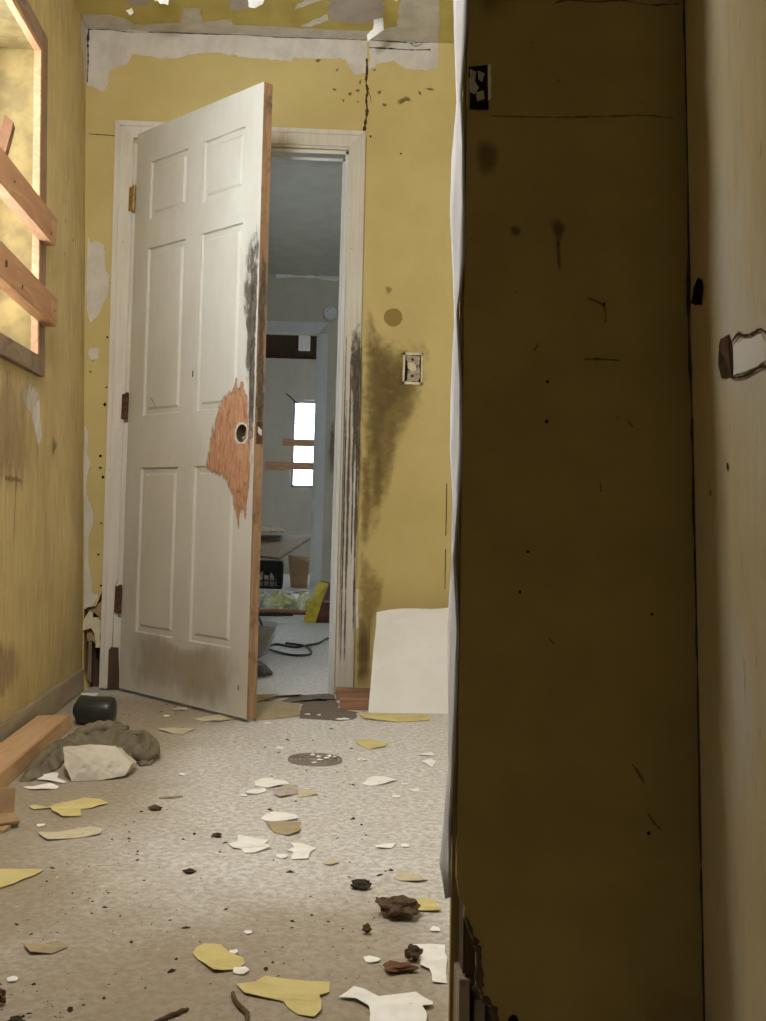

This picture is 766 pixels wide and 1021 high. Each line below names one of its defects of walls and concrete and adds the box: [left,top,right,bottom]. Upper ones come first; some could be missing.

crack [84,29,431,131]
peeling [82,0,440,92]
peeling [86,238,110,323]
leakage [384,309,402,326]
peeling [21,382,42,445]
peeling [416,0,468,911]
leakage [329,332,414,672]
crack [492,0,705,1021]
peeling [281,693,430,722]
peeling [23,772,67,789]
peeling [29,797,108,839]
peeling [260,811,317,859]